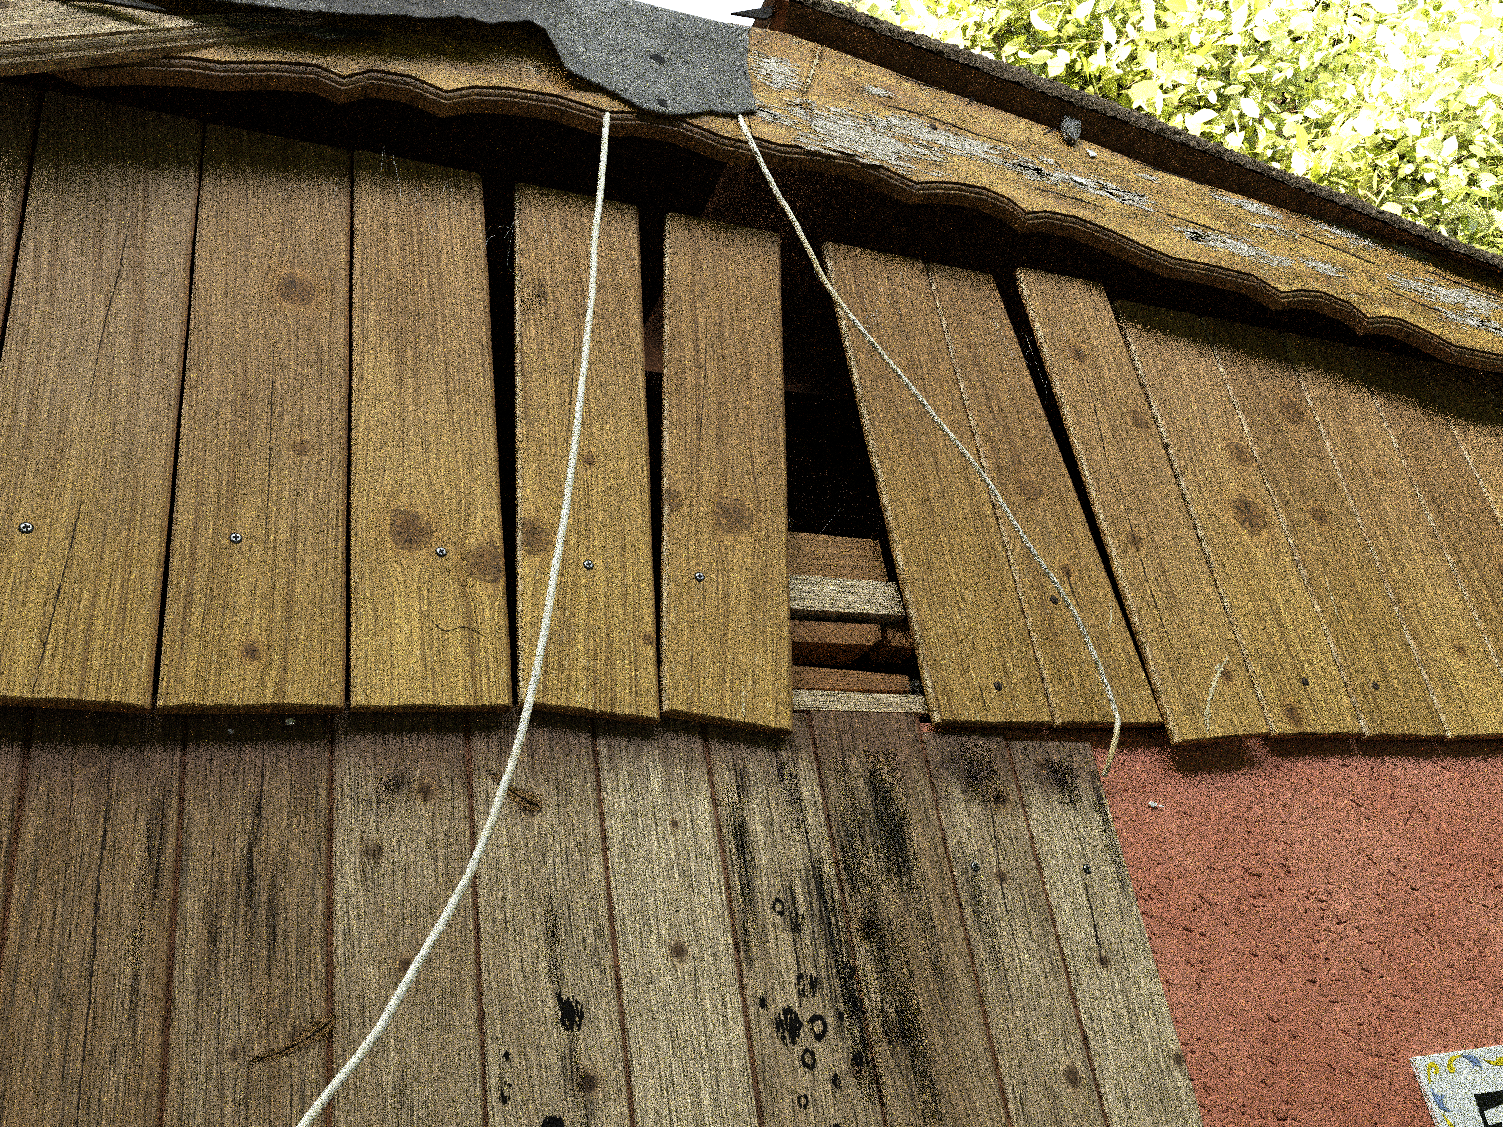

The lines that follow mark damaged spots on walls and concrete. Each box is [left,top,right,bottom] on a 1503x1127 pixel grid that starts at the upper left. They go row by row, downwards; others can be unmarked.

crack [88,212,132,401]
peeling [1171,191,1503,337]
crack [32,500,82,693]
water stain [837,773,912,901]
water stain [565,1042,592,1127]
water stain [781,838,869,1068]
water stain [864,899,936,1100]